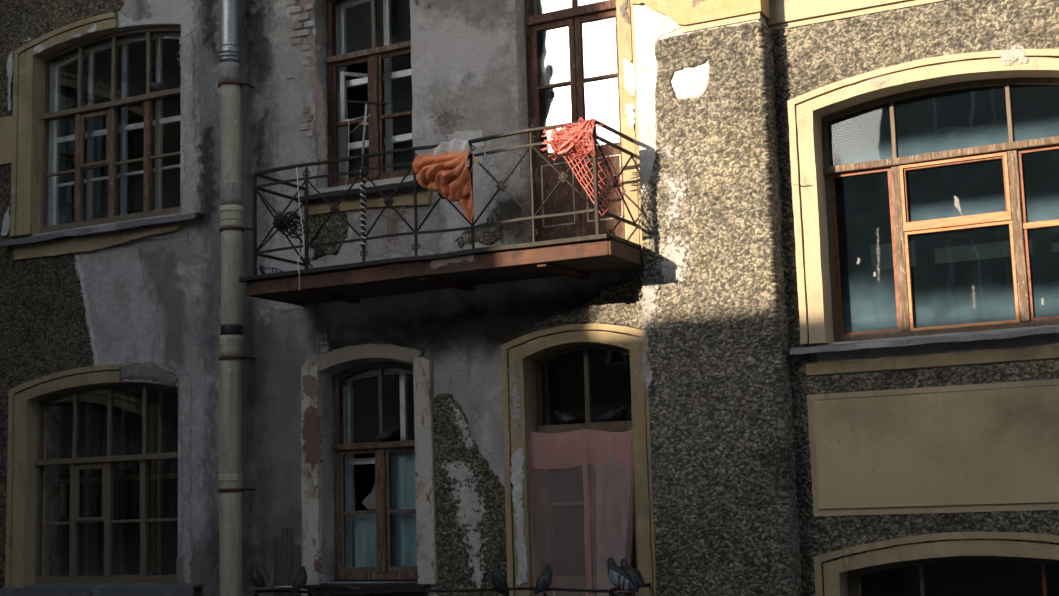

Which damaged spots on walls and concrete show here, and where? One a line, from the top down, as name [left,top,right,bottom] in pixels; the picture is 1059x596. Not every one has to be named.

peeling [120,0,149,25]
peeling [179,28,203,247]
water stain [199,128,217,223]
water stain [202,0,218,58]
water stain [247,1,271,94]
peeling [253,0,328,219]
peeling [619,0,681,196]
flaking render [671,61,710,100]
peeling [74,244,192,584]
flaking render [302,375,323,471]
peeling [441,398,493,589]